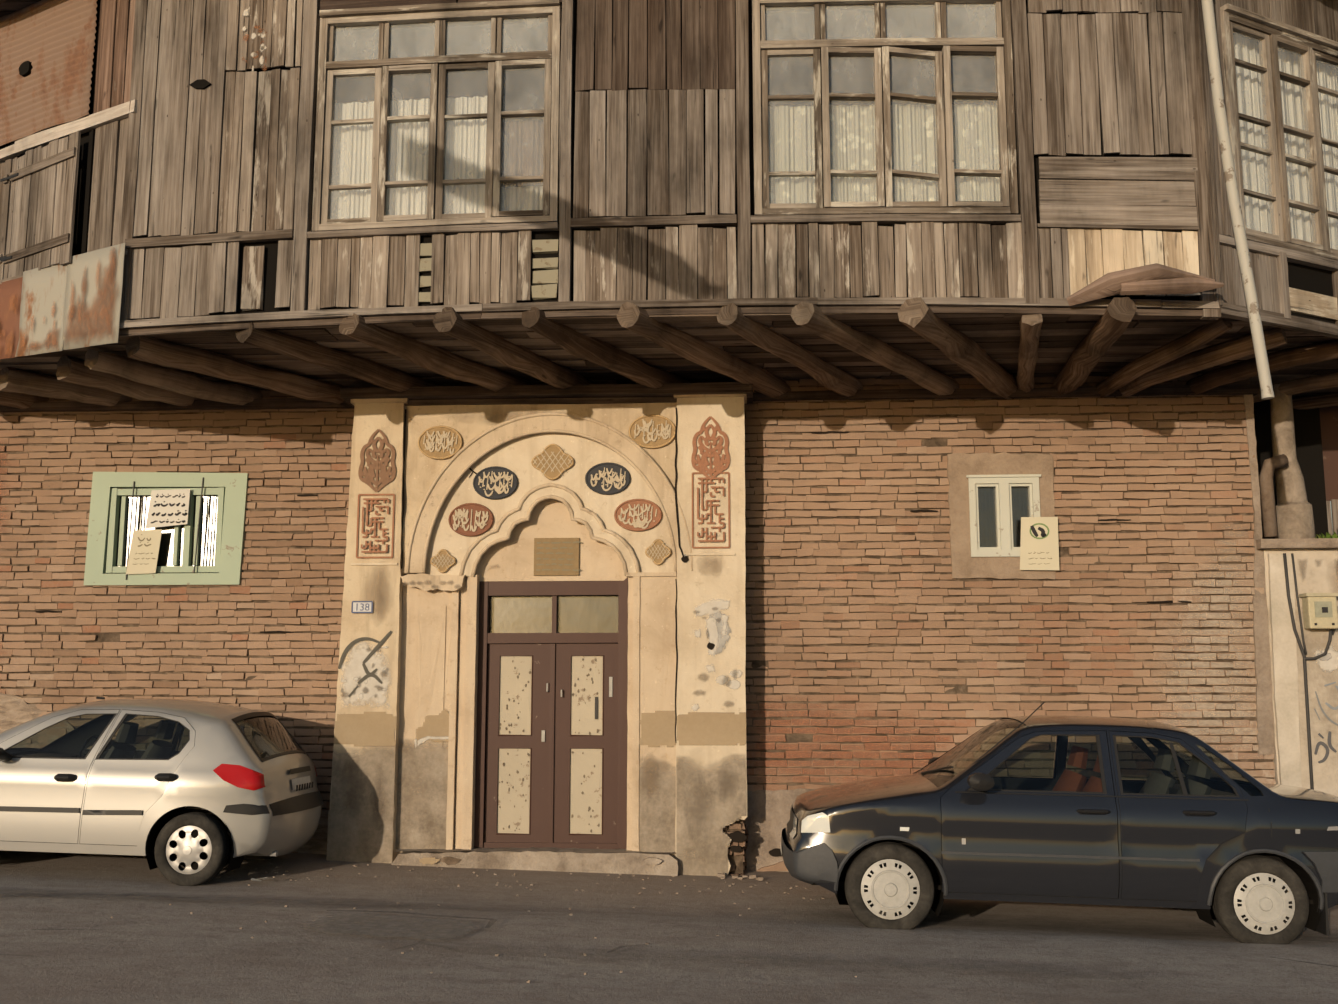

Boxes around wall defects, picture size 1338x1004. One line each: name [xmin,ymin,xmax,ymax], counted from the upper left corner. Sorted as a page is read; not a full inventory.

corrosion [8,250,115,353]
peeling [338,631,392,706]
peeling [695,600,742,689]
damp [326,709,449,864]
damp [639,758,746,876]
spalling [717,816,764,881]
damp [771,714,934,775]